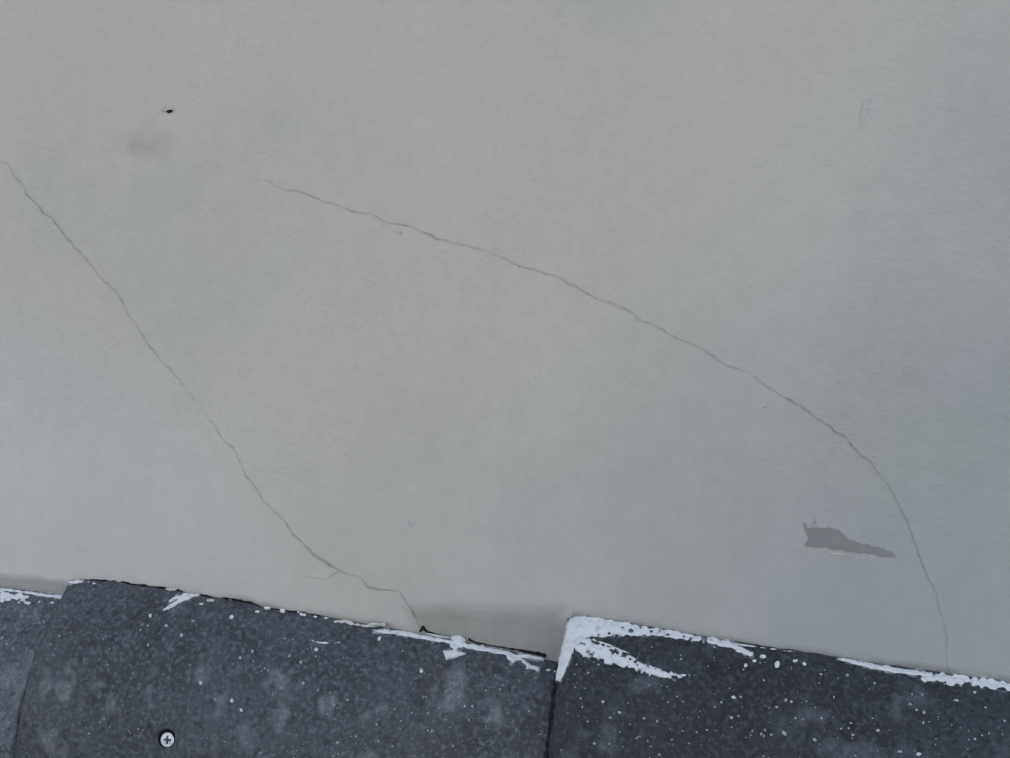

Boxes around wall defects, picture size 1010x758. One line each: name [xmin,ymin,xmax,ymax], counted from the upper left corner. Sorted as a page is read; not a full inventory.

peeling [804,522,895,559]